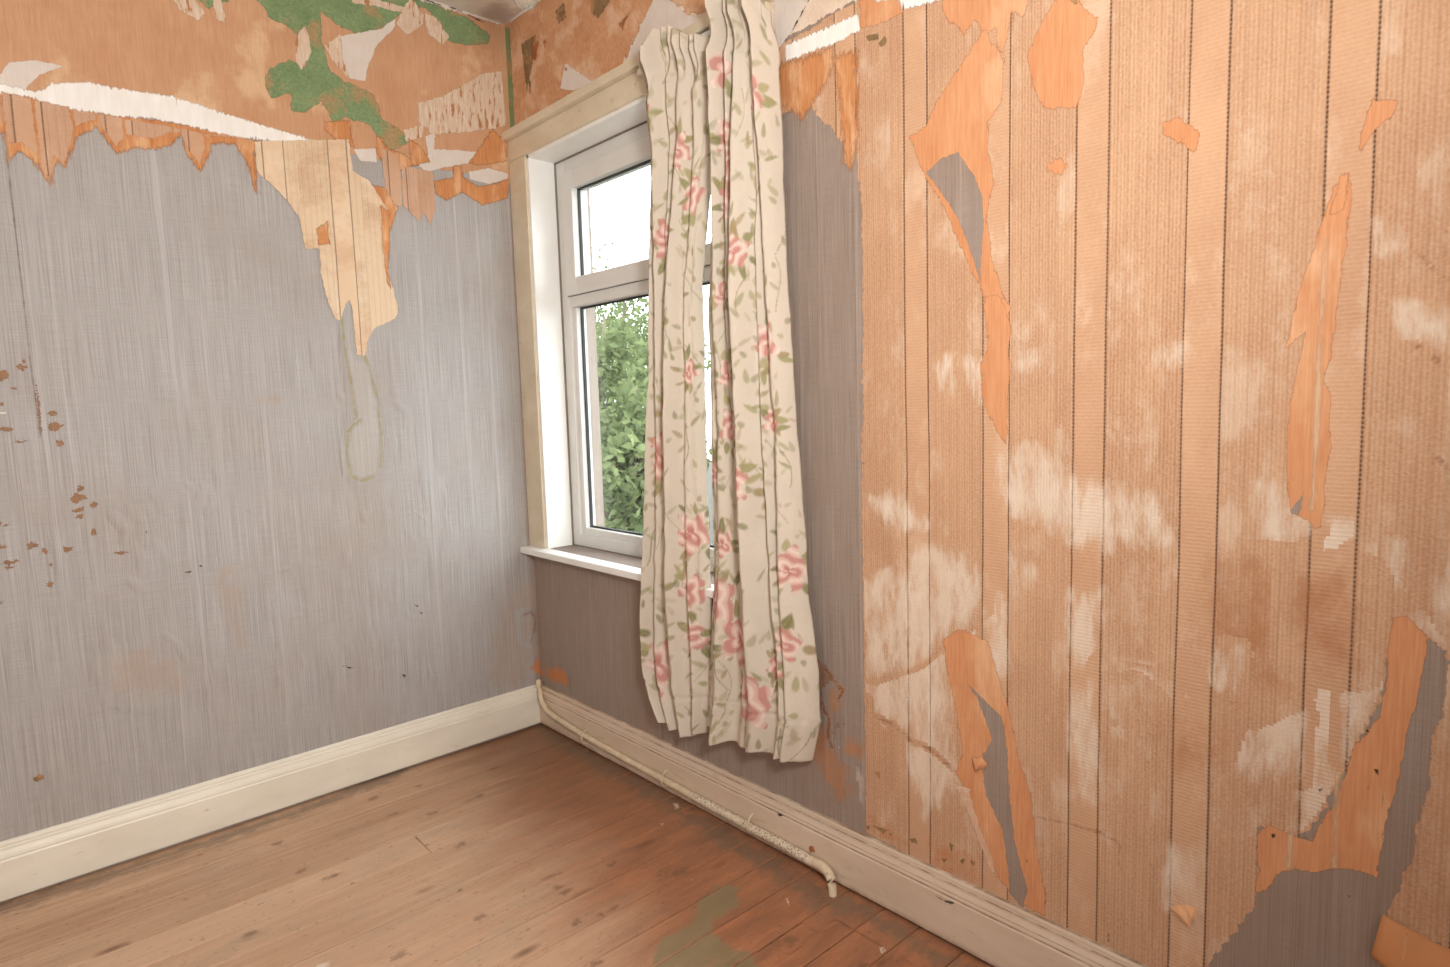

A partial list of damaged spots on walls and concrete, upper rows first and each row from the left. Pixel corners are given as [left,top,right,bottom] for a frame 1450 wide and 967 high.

flaking render [0,60,65,90]
flaking render [341,19,395,81]
flaking render [354,148,377,163]
flaking render [419,134,508,184]
peeling [16,359,64,447]
peeling [71,485,98,536]
peeling [3,541,73,587]